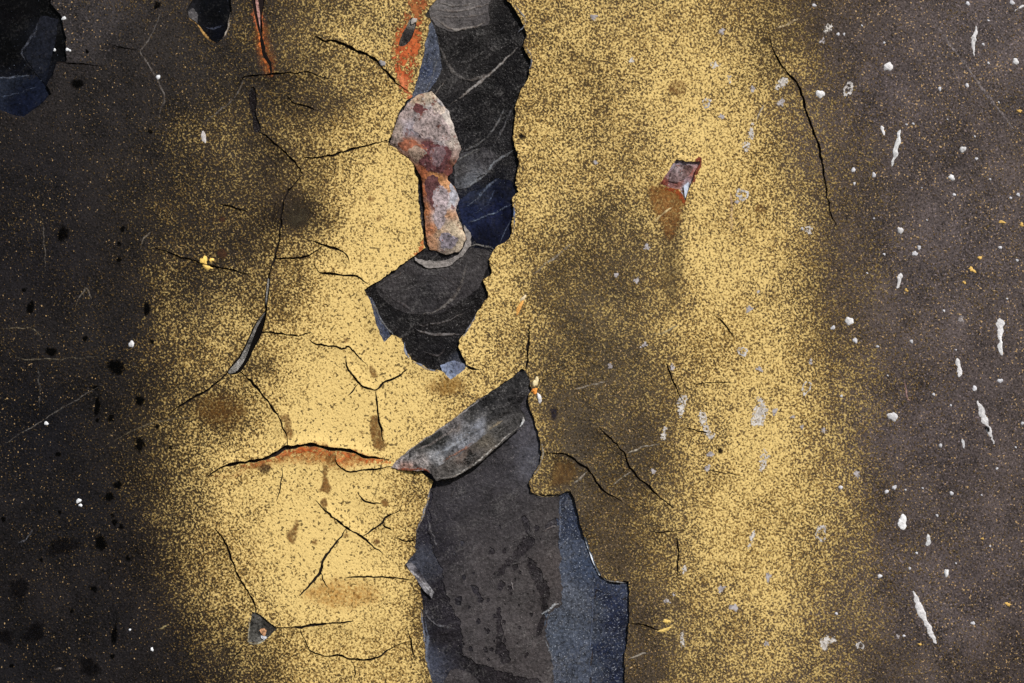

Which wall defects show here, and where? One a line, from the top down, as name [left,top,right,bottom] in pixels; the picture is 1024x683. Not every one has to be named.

peeling [0,0,67,116]
peeling [187,0,232,44]
rust [251,0,273,77]
crack [315,36,408,91]
rust [379,0,471,268]
peeling [364,0,532,379]
crack [770,41,836,224]
crack [157,133,414,596]
rust [241,446,391,473]
peeling [392,368,629,683]
spalling [248,611,278,645]
crack [278,621,415,677]